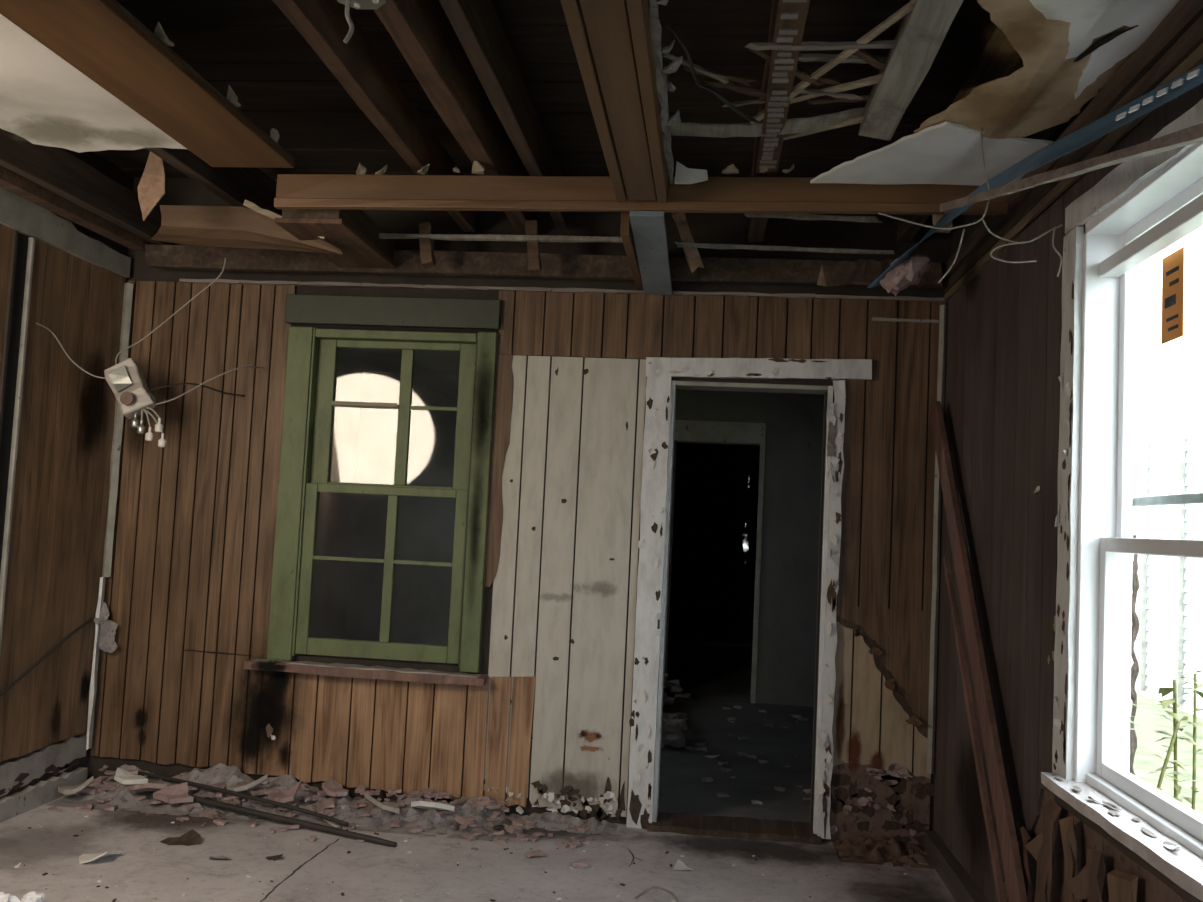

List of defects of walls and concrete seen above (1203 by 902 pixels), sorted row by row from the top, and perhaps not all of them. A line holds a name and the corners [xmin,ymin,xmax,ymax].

peeling [648,442,668,469]
peeling [832,413,843,497]
peeling [638,506,664,549]
peeling [826,579,839,636]
damp [241,660,293,765]
spalling [818,732,935,848]